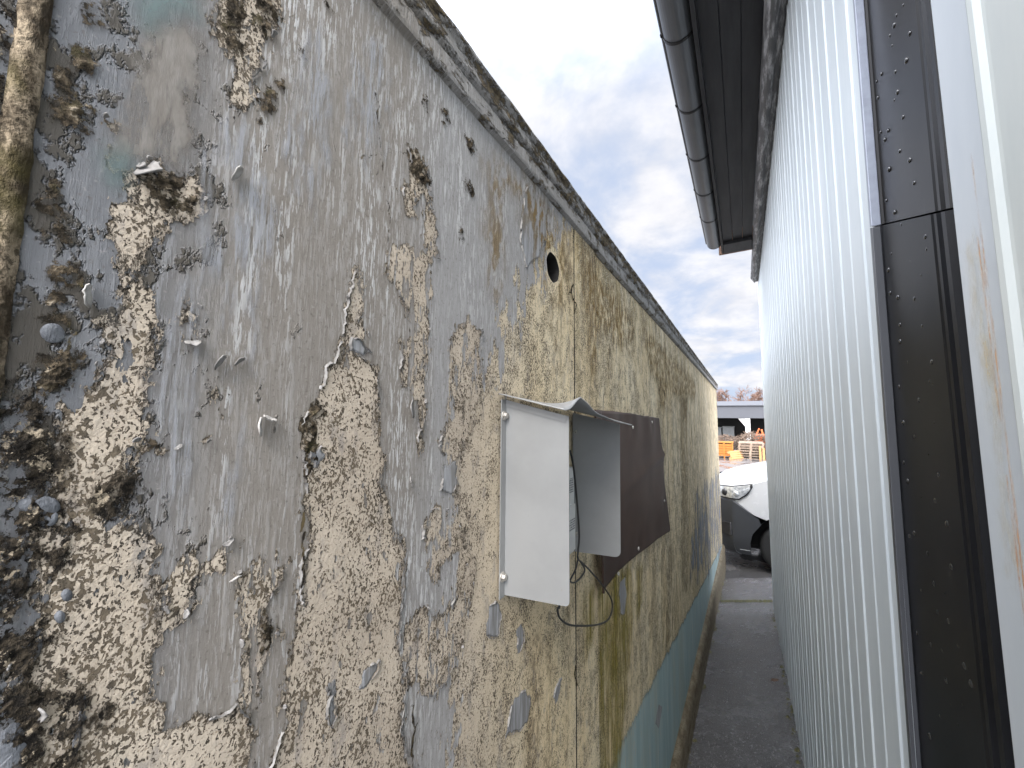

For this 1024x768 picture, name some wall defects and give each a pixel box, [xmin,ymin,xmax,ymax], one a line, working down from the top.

peeling [204,0,286,114]
peeling [0,112,484,768]